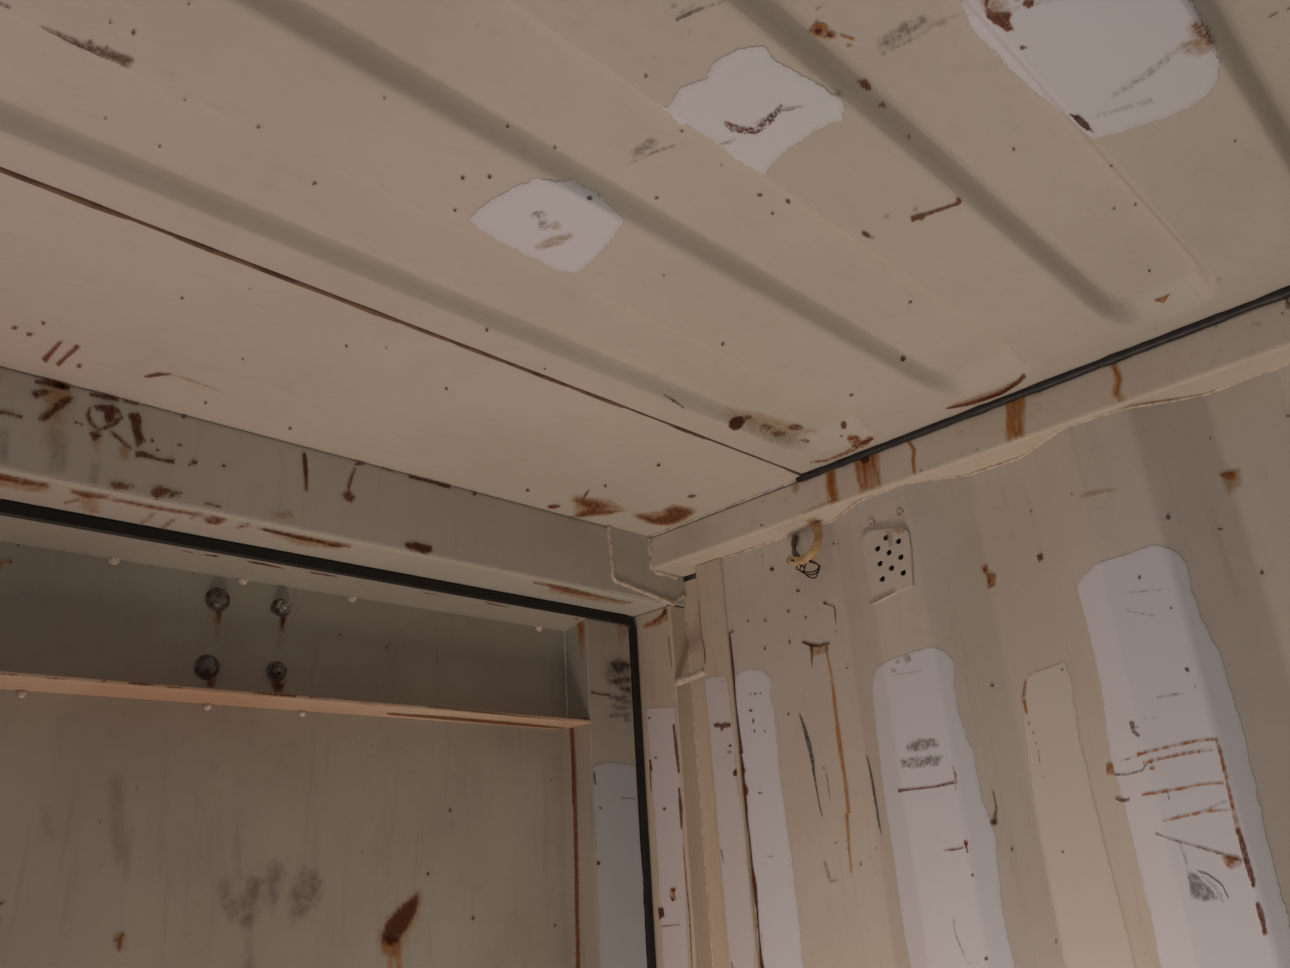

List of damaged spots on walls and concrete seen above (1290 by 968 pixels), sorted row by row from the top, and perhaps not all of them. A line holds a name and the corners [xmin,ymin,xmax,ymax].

peeling [1070,115,1093,132]
rust [32,342,82,421]
rust [1110,365,1122,402]
rust [75,392,198,465]
rust [729,416,810,443]
rust [810,422,879,503]
rust [574,485,615,517]
rust [636,495,695,525]
rust [788,602,862,866]
rust [381,706,588,968]
peeling [1021,662,1135,968]
peeling [1188,872,1228,904]